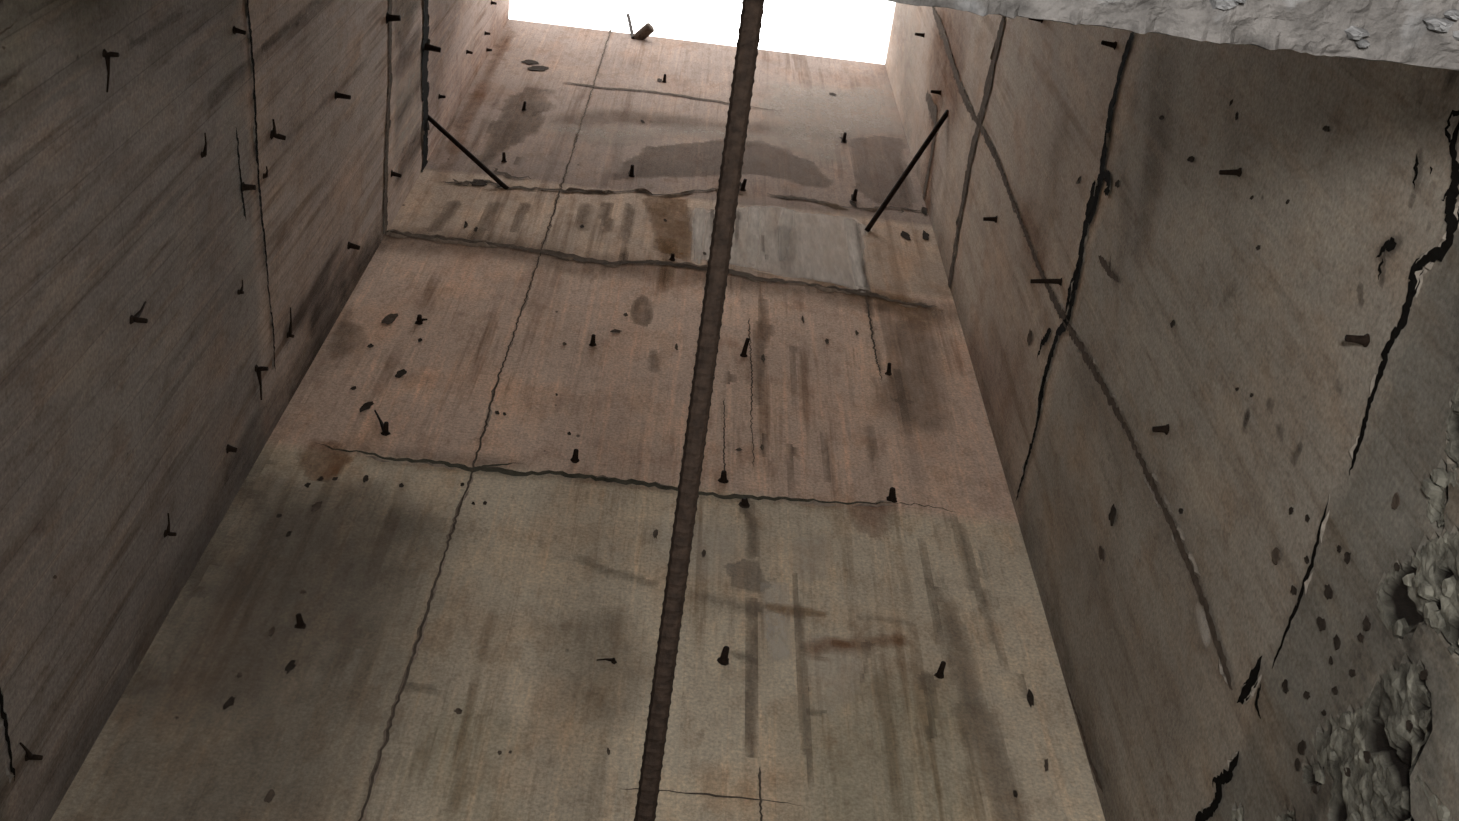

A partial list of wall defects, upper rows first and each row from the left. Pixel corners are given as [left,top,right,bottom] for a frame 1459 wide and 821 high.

crack [236,0,275,369]
crack [318,0,1459,821]
spalling [1272,547,1281,565]
spalling [1317,382,1459,695]
crack [0,688,15,784]
spalling [1282,679,1310,699]
spalling [1295,661,1455,821]